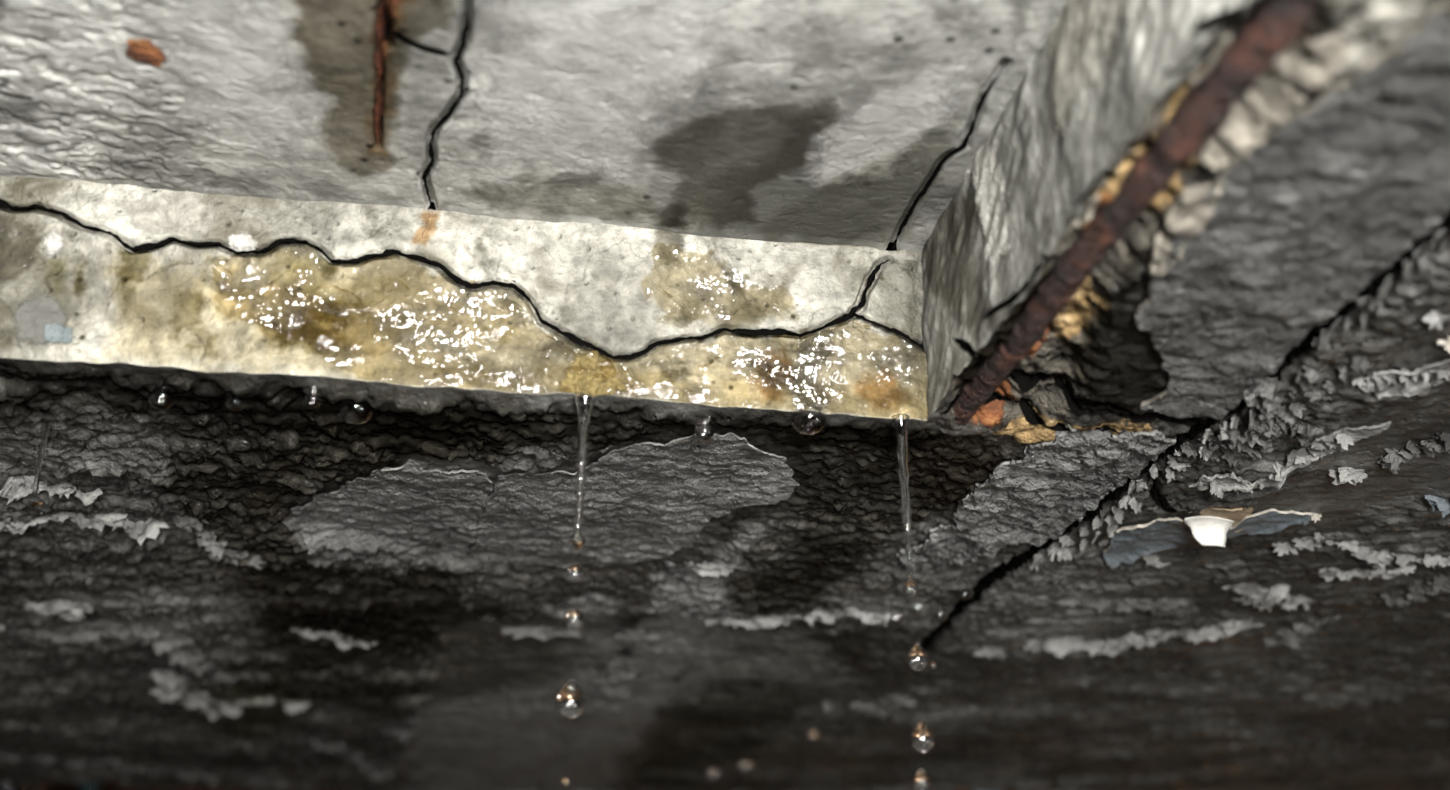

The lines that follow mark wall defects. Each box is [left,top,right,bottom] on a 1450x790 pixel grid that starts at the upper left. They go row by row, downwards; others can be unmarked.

water stain [228,233,258,257]
crack [0,0,1006,360]
water stain [474,0,733,182]
water stain [814,54,971,185]
rust [1028,275,1106,356]
rust [1079,40,1219,228]
peeling [896,0,1450,607]
rust [972,378,1151,444]
crack [895,210,1450,693]
peeling [0,475,268,569]
peeling [0,597,312,720]
peeling [1022,582,1340,658]